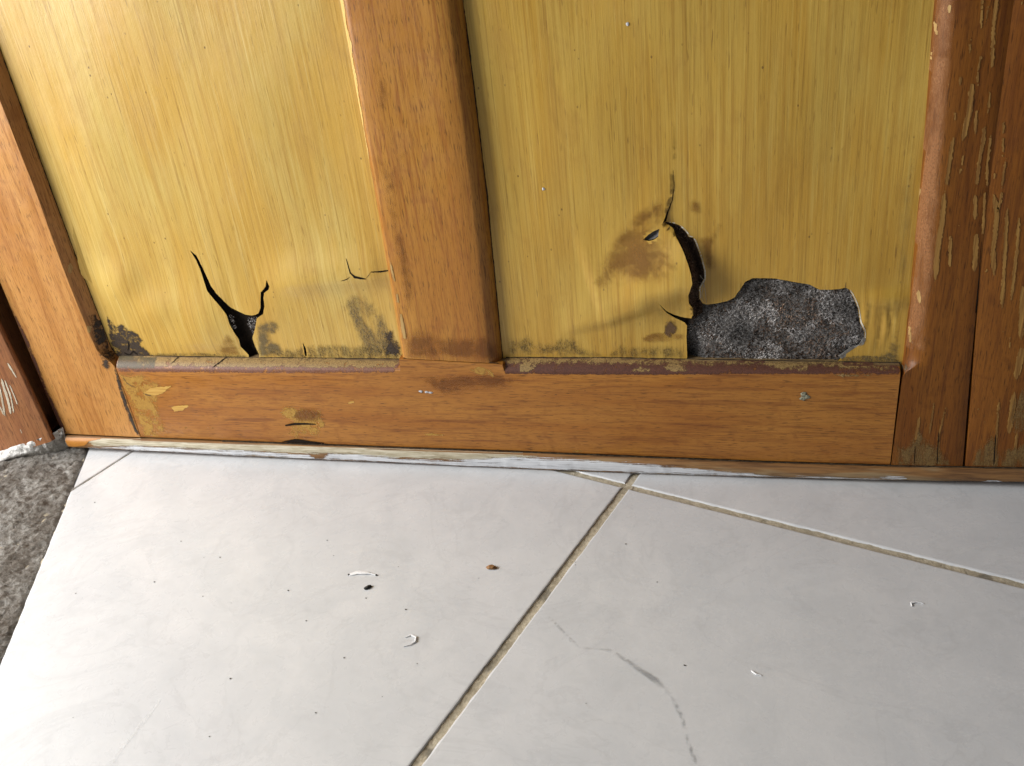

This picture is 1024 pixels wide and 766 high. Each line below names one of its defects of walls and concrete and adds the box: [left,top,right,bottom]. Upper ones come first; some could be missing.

crack [663,174,674,223]
crack [342,259,388,281]
crack [192,252,269,368]
water stain [259,302,400,358]
crack [668,312,693,325]
spalling [686,278,866,360]